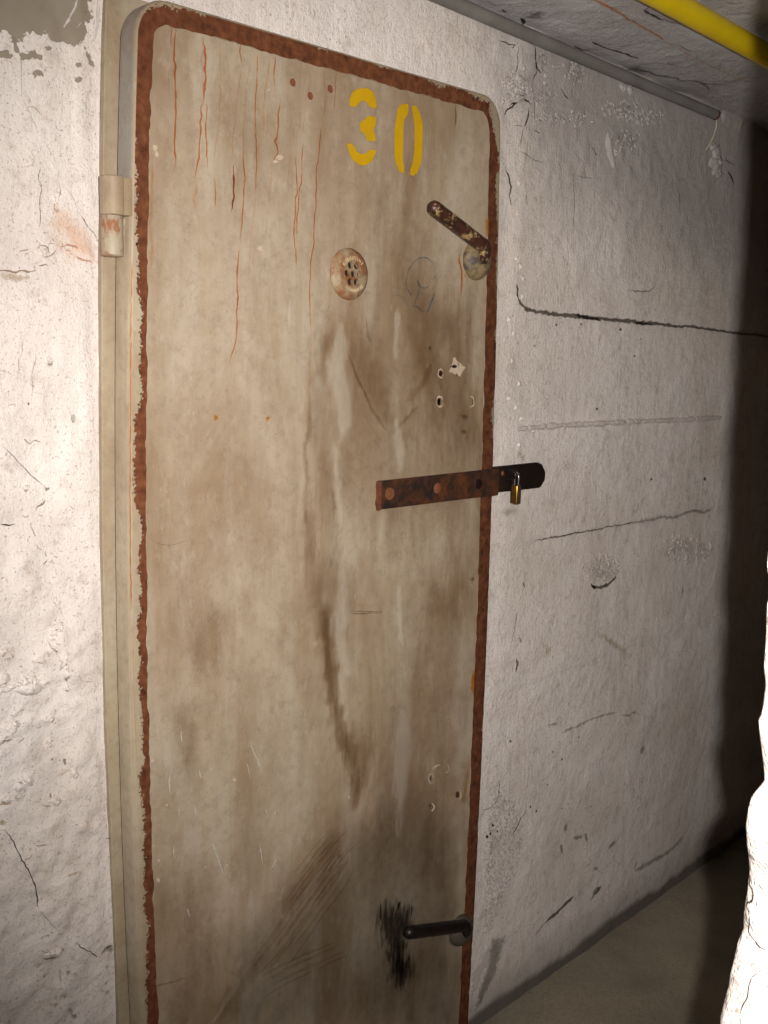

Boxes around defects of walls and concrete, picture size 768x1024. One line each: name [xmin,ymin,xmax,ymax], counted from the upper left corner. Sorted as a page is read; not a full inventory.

peeling [0,0,100,83]
crack [499,9,541,133]
crack [592,41,639,59]
crack [516,285,768,338]
rust [132,4,500,1024]
crack [536,522,633,541]
crack [6,832,38,906]